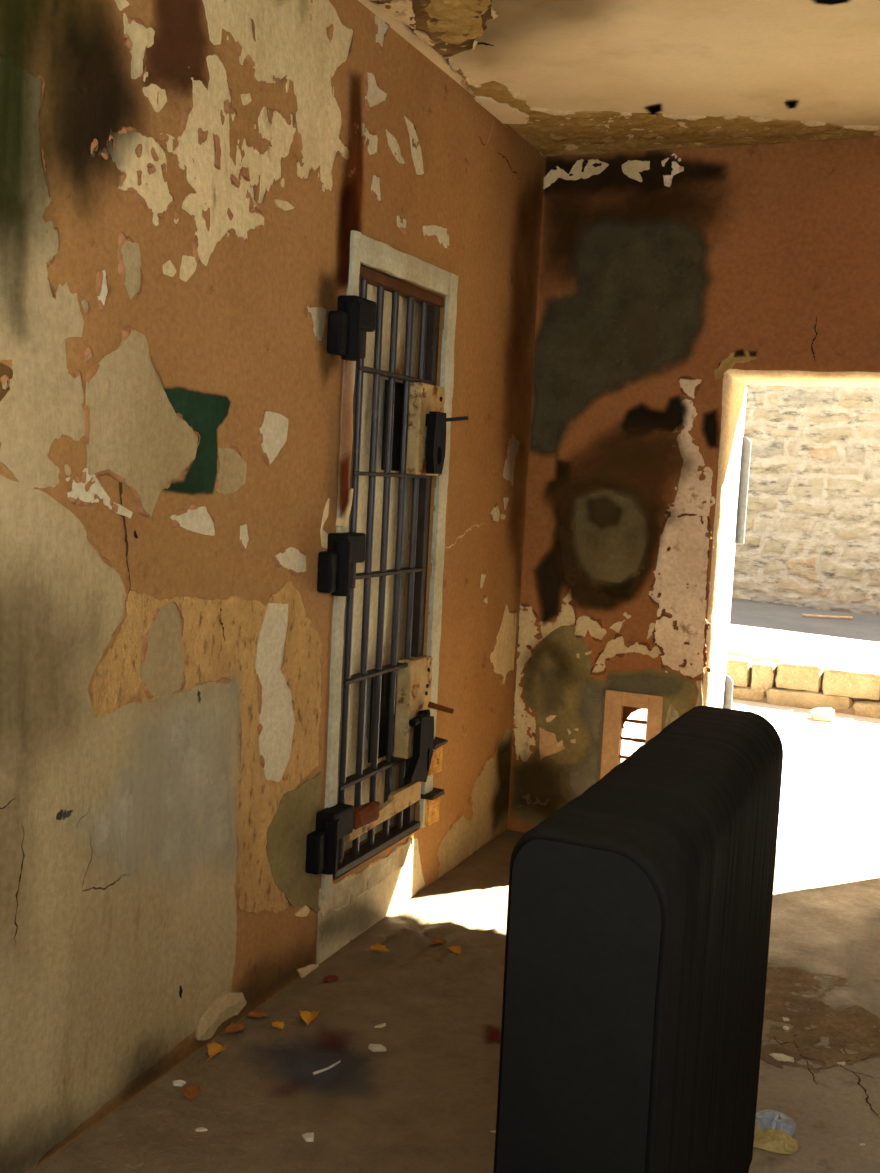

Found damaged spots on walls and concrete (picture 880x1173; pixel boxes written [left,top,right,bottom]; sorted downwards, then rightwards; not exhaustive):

damp [54,14,137,189]
flaking render [91,0,354,282]
spalling [367,0,880,189]
peeling [422,225,449,249]
damp [508,178,714,477]
flaking render [0,72,425,1173]
flaking render [437,350,757,878]
damp [547,431,684,609]
spalling [760,963,880,1073]
crack [774,1030,880,1118]